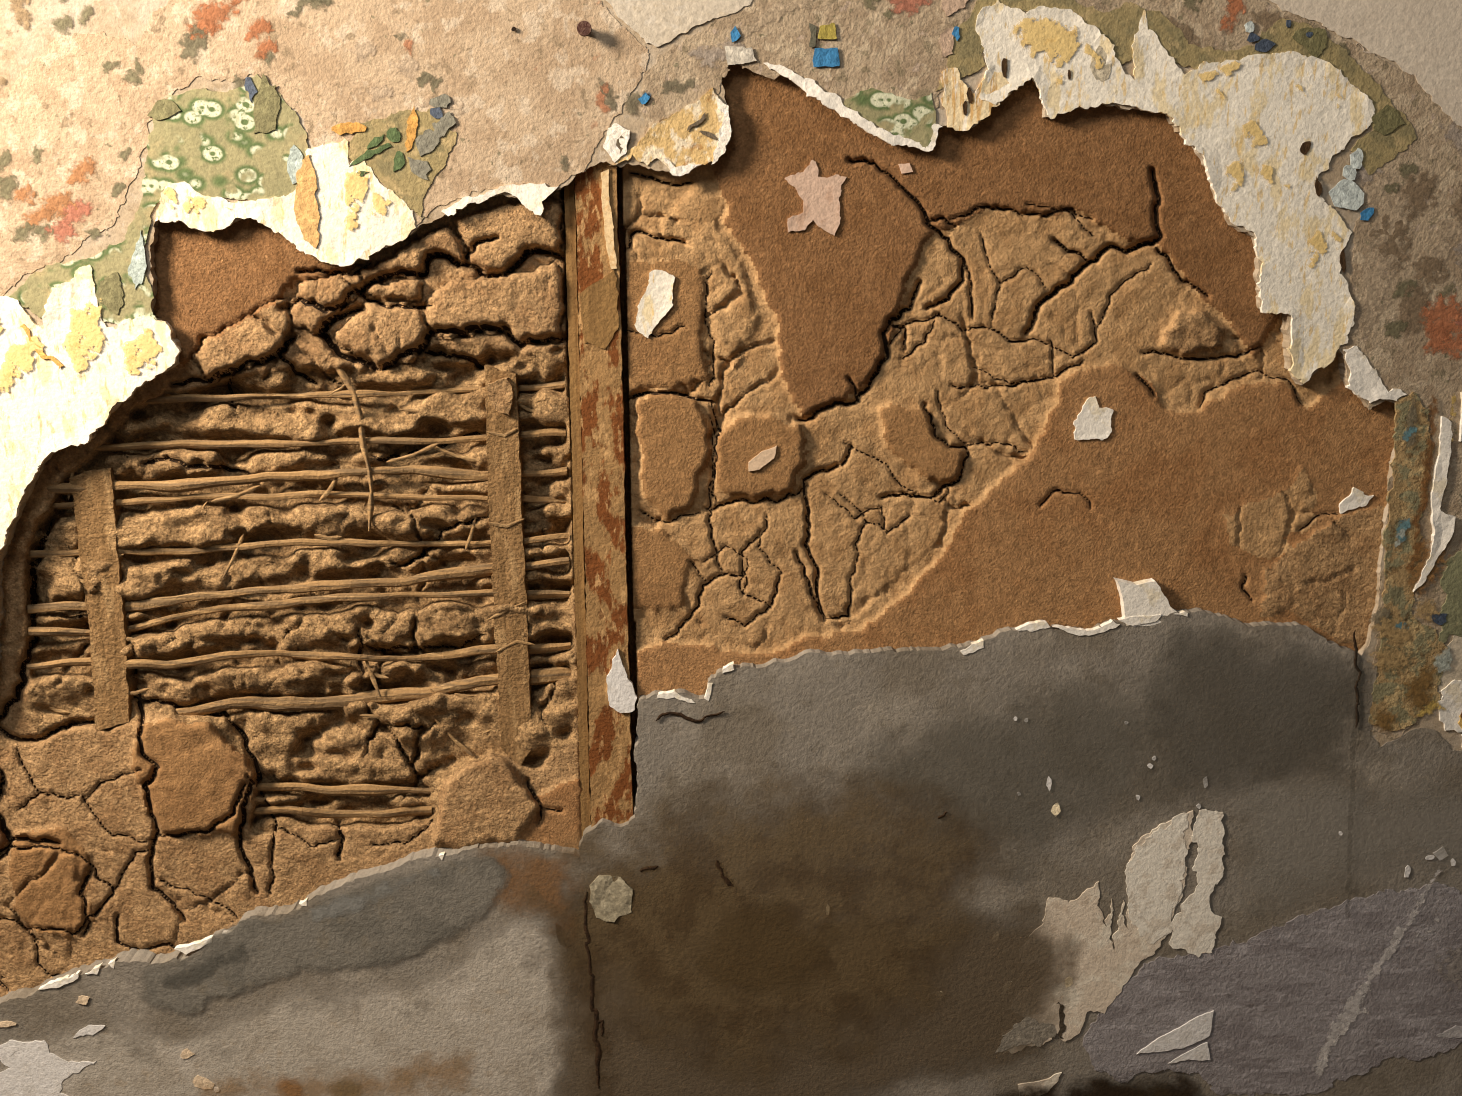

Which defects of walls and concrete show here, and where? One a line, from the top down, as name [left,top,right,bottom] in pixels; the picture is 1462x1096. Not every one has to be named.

peeling [177,0,280,133]
crack [144,456,251,475]
crack [173,237,563,408]
crack [624,159,1208,640]
flaking render [580,23,1462,805]
crack [1136,347,1301,406]
flaking render [0,145,582,997]
crack [0,519,433,976]
peeling [0,1021,96,1096]
water stain [556,901,1063,1096]
water stain [1006,1076,1198,1096]
peeling [995,776,1462,1096]